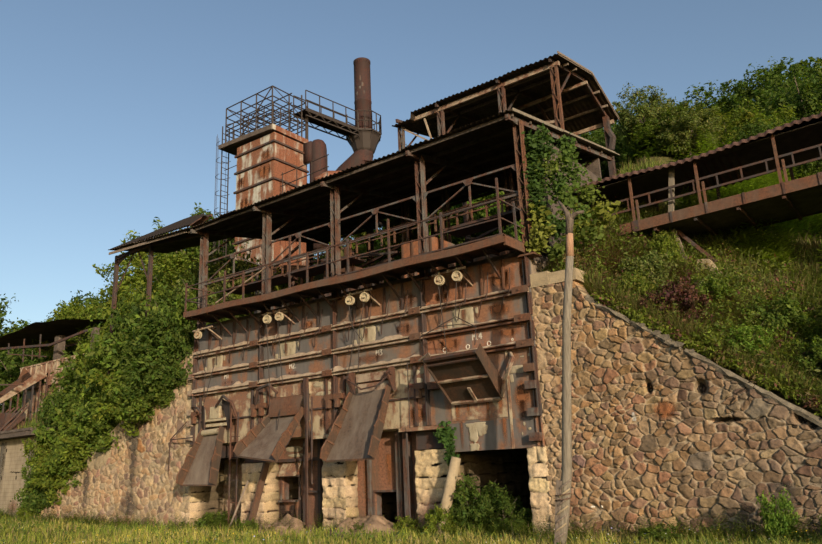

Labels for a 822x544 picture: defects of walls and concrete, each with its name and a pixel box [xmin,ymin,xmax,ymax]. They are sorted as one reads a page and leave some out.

corrosion [491,263,526,286]
corrosion [516,383,528,418]
peeling [460,422,488,451]